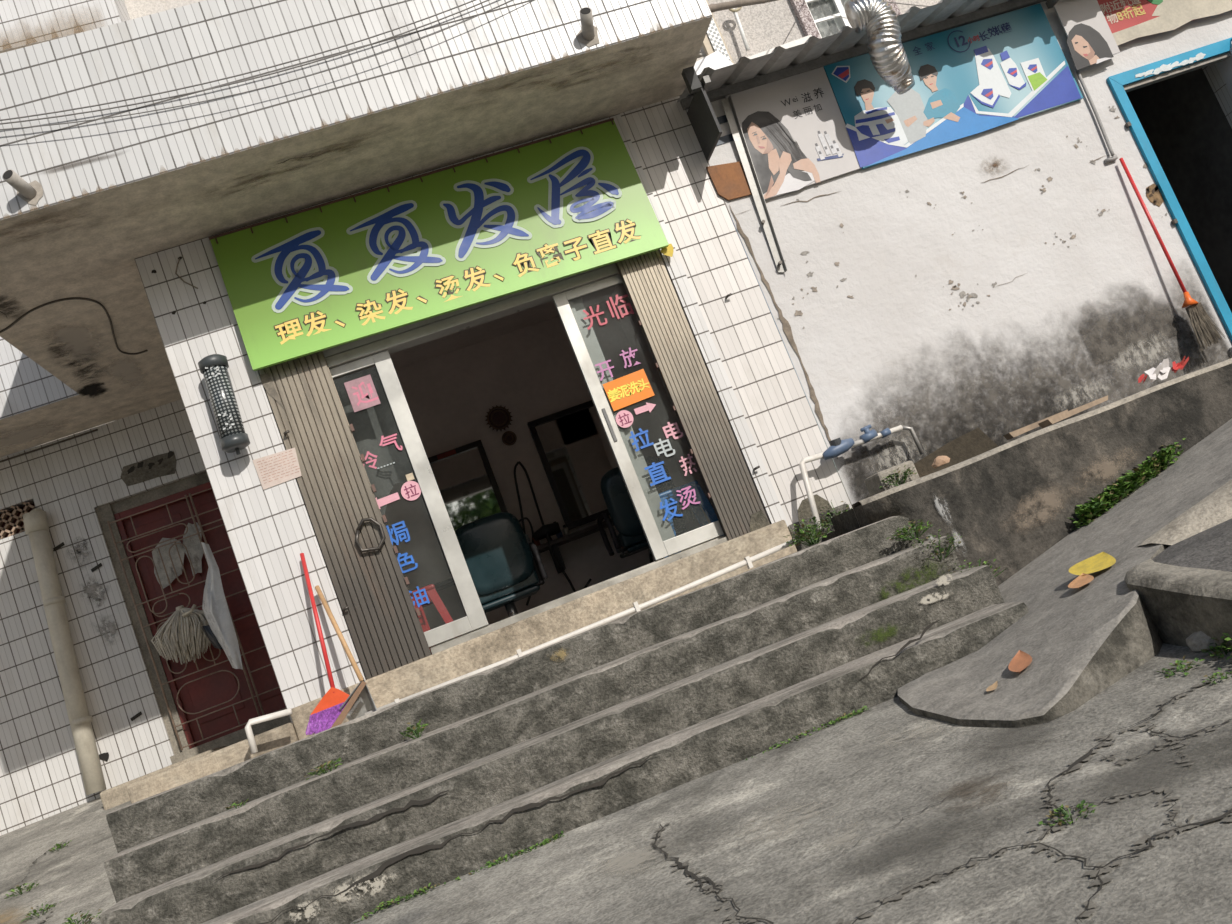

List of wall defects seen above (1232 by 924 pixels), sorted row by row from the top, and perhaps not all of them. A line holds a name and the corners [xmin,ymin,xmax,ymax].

peeling [943,280,997,310]
damp [53,341,106,397]
damp [845,291,1232,500]
damp [1015,491,1061,527]
crack [858,620,940,681]
crack [652,681,1232,924]
spalling [290,874,396,921]